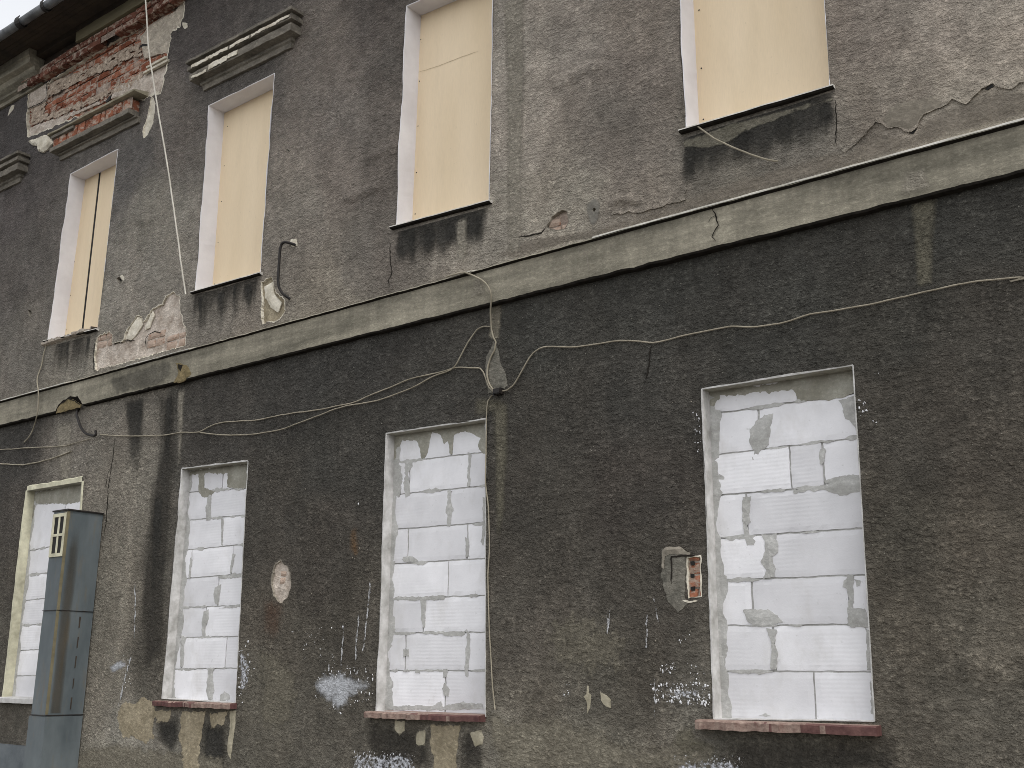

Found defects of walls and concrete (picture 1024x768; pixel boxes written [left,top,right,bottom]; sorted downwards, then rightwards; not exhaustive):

flaking render [26,1,188,153]
leakage [683,93,833,169]
flaking render [502,56,1024,255]
leakage [397,208,485,260]
leakage [57,338,90,362]
flaking render [94,291,187,371]
leakage [194,277,257,317]
flaking render [261,277,286,324]
leakage [112,363,169,449]
leakage [144,392,183,663]
flaking render [271,560,291,603]
flaking render [78,697,236,768]